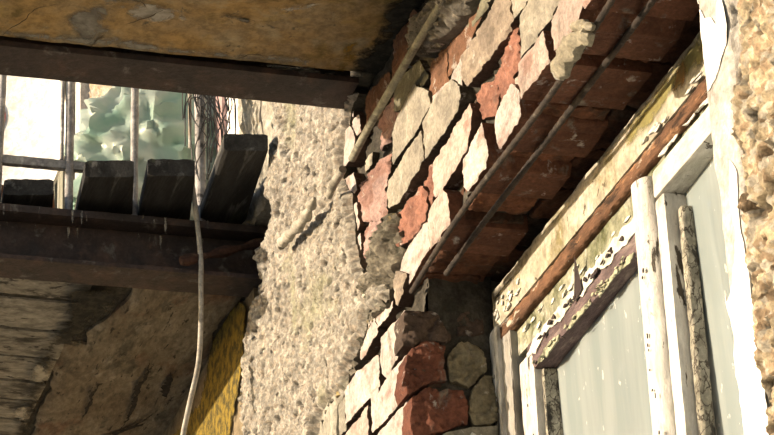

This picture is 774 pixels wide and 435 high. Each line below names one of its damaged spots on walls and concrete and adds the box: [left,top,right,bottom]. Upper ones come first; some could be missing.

peeling [129,4,185,21]
leakage [351,0,425,90]
leakage [626,36,703,145]
corrosion [674,61,686,91]
peeling [658,0,727,157]
peeling [641,116,667,145]
peeling [522,215,637,364]
crack [82,385,99,418]
crack [112,363,173,435]